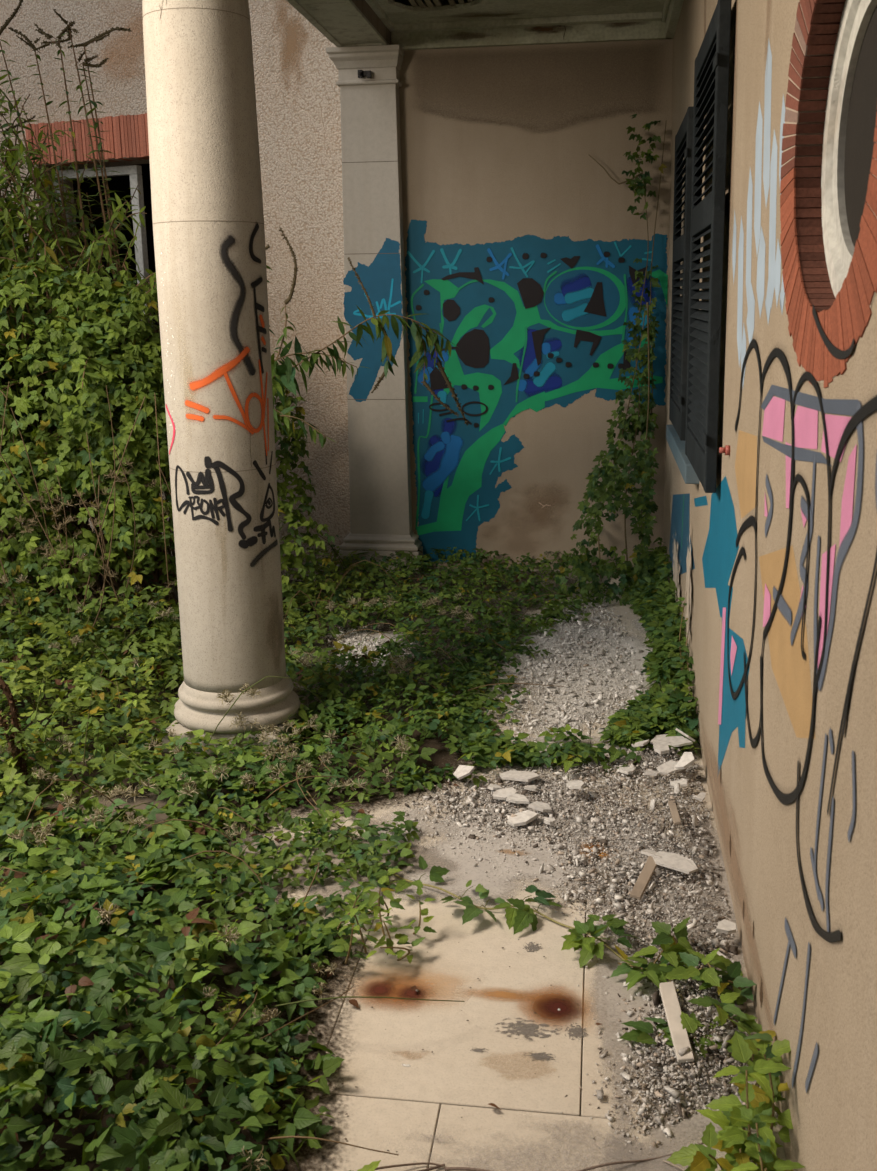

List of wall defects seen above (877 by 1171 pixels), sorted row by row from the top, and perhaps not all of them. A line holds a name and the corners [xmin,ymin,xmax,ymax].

rust [367,975,435,1005]
rust [481,990,577,1022]